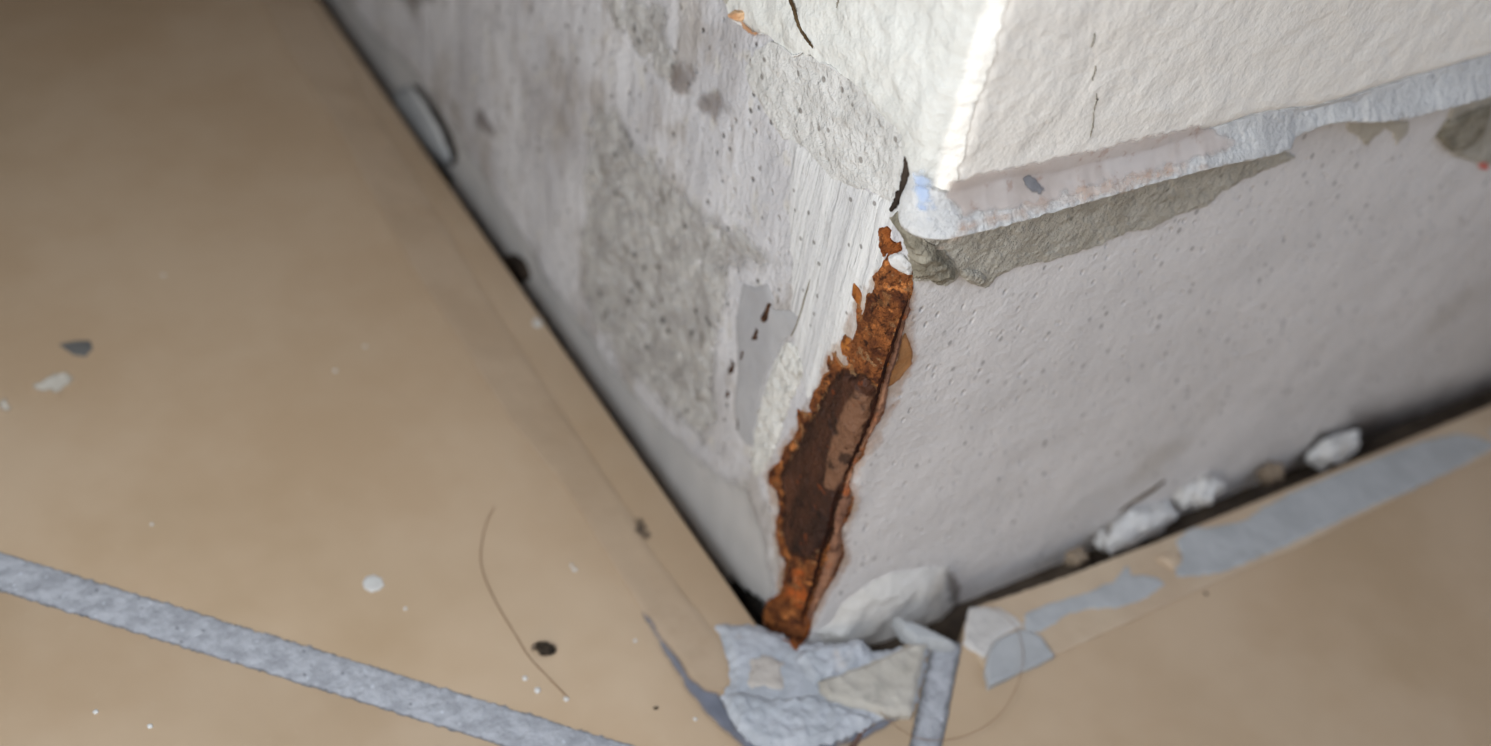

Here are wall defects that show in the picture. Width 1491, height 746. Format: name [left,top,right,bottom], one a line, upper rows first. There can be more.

crack [788,0,813,49]
spalling [1346,120,1409,145]
spalling [1436,96,1491,165]
spalling [888,152,1295,288]
spalling [582,110,810,476]
rust [763,226,913,651]